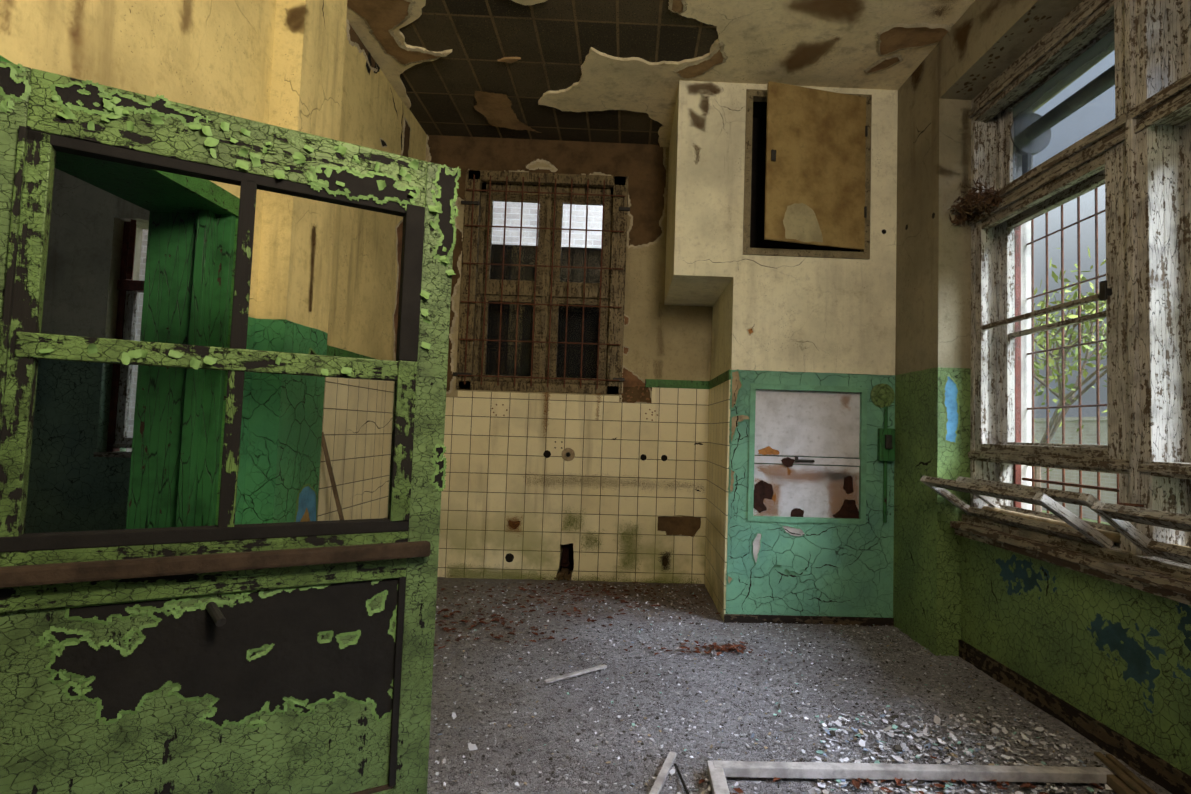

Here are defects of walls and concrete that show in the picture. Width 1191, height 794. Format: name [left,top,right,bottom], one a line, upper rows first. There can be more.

leakage [63,0,90,79]
leakage [179,0,196,34]
spalling [346,0,446,75]
spalling [672,42,728,80]
leakage [778,0,871,75]
leakage [911,60,925,91]
leakage [926,0,1017,63]
peeling [942,375,960,445]
corrosion [753,446,859,518]
peeling [657,516,701,537]
crack [773,551,863,602]
peeling [1086,602,1191,714]